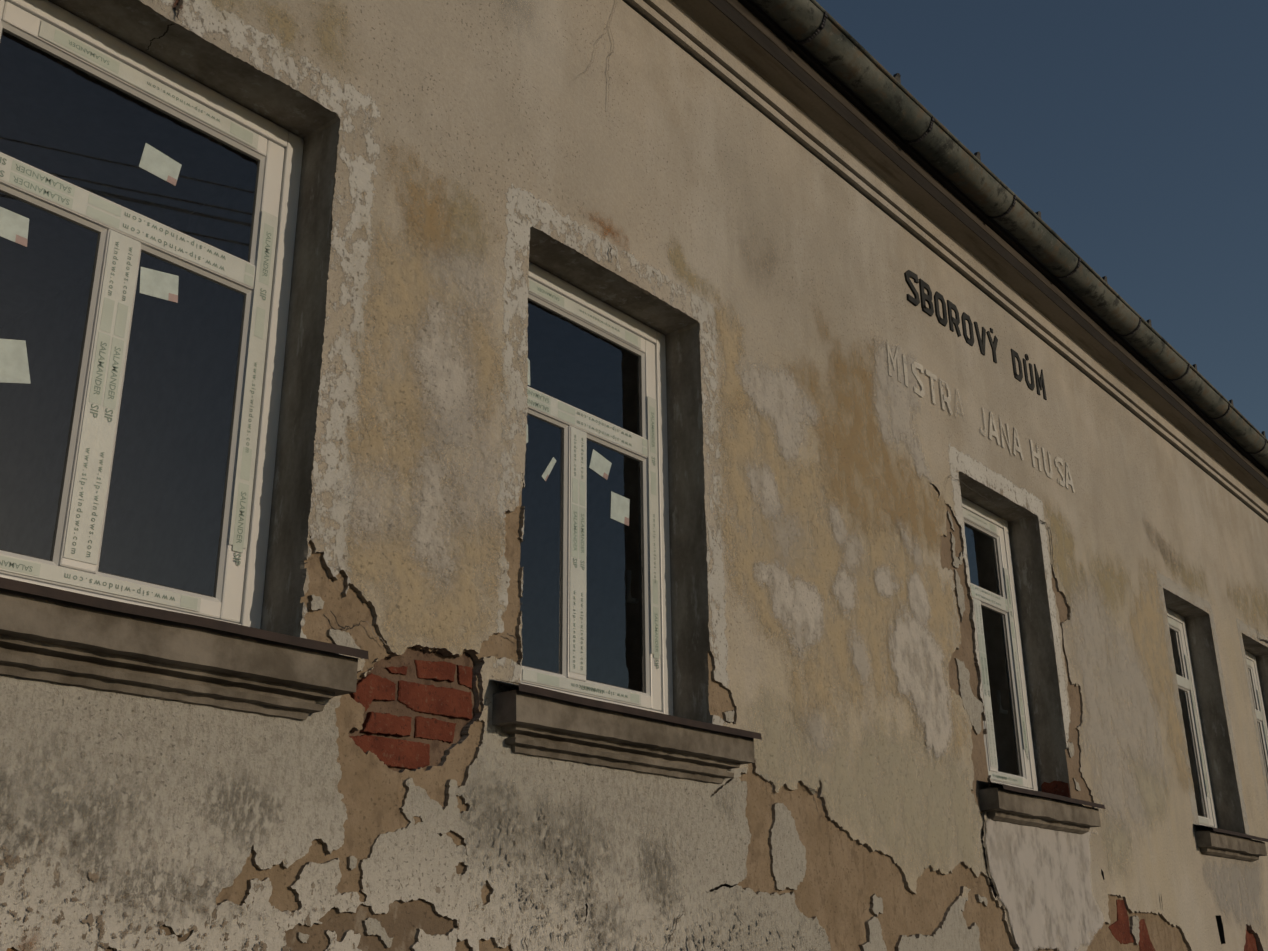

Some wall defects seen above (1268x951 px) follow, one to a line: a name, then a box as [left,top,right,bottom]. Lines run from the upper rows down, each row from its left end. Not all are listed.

crack [147,0,183,50]
spalling [0,0,737,951]
water stain [349,180,505,484]
water stain [348,471,506,652]
peeling [746,465,782,519]
peeling [735,364,817,461]
peeling [754,505,863,659]
spalling [874,443,1094,819]
spalling [734,763,1017,951]
spalling [1086,894,1192,951]